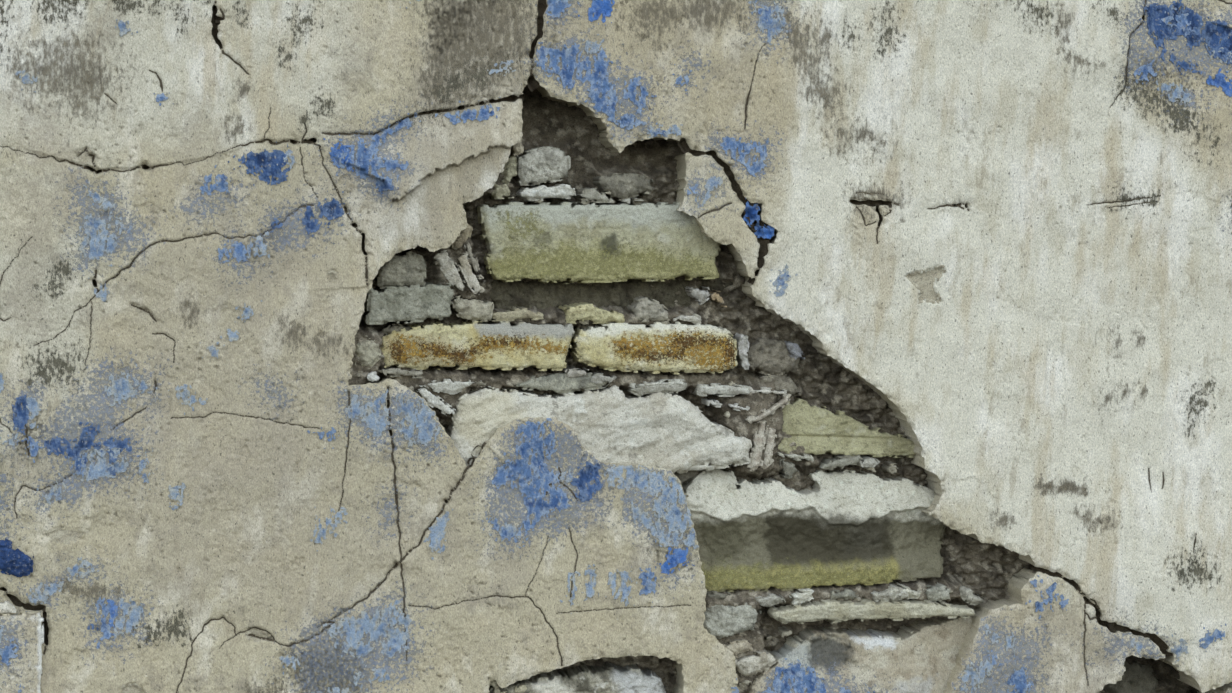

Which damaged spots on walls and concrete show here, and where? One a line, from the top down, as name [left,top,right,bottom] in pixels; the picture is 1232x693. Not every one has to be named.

crack [0,0,548,366]
crack [0,418,30,456]
crack [0,587,49,654]
crack [14,474,73,518]
peeling [0,347,208,693]
crack [111,304,351,511]
crack [176,386,691,693]
flaking render [307,0,1232,693]